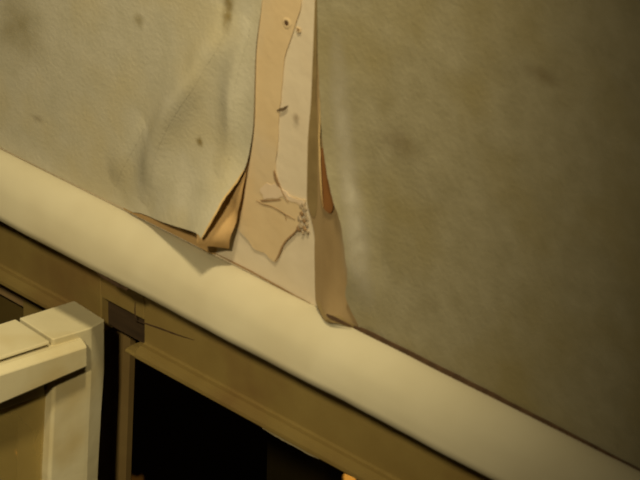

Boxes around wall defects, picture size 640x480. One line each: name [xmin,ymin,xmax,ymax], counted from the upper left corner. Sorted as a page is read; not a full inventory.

peeling [235,0,309,262]